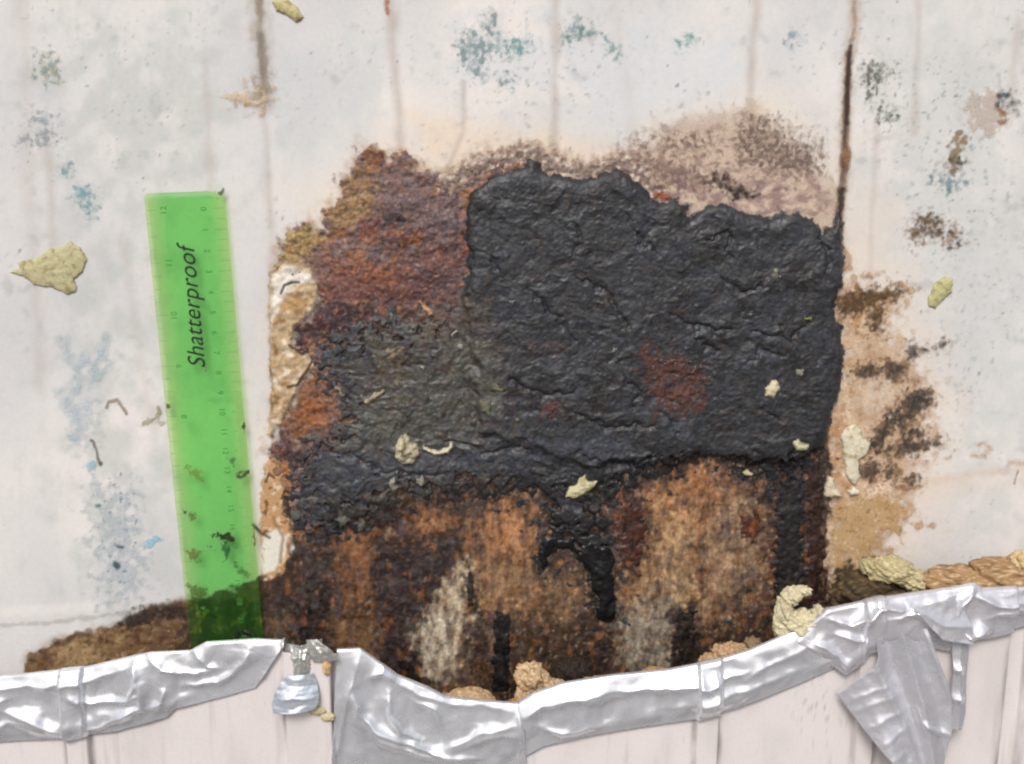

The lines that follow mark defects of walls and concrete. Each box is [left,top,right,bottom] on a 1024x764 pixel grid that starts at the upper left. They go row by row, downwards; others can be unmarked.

peeling [435,138,671,202]
damp [629,111,838,235]
crack [834,0,857,260]
damp [861,59,900,124]
damp [908,212,963,249]
damp [947,89,1017,175]
peeling [266,263,318,437]
corrosion [174,143,845,701]
damp [823,261,950,607]
peeling [252,457,292,581]